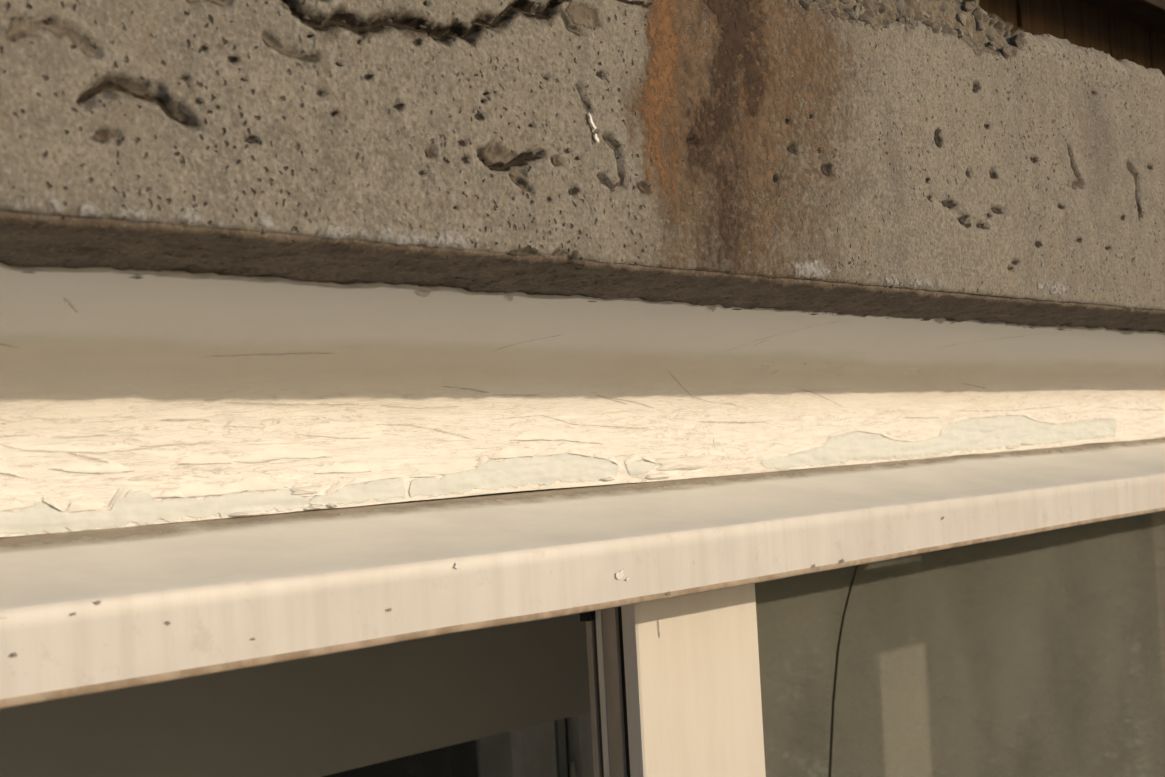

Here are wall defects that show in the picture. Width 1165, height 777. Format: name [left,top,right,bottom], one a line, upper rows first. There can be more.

crack [281,0,582,44]
crack [621,0,652,8]
spalling [790,0,1026,59]
rust [633,0,856,280]
peeling [757,411,1117,471]
crack [0,460,134,511]
peeling [0,448,671,535]